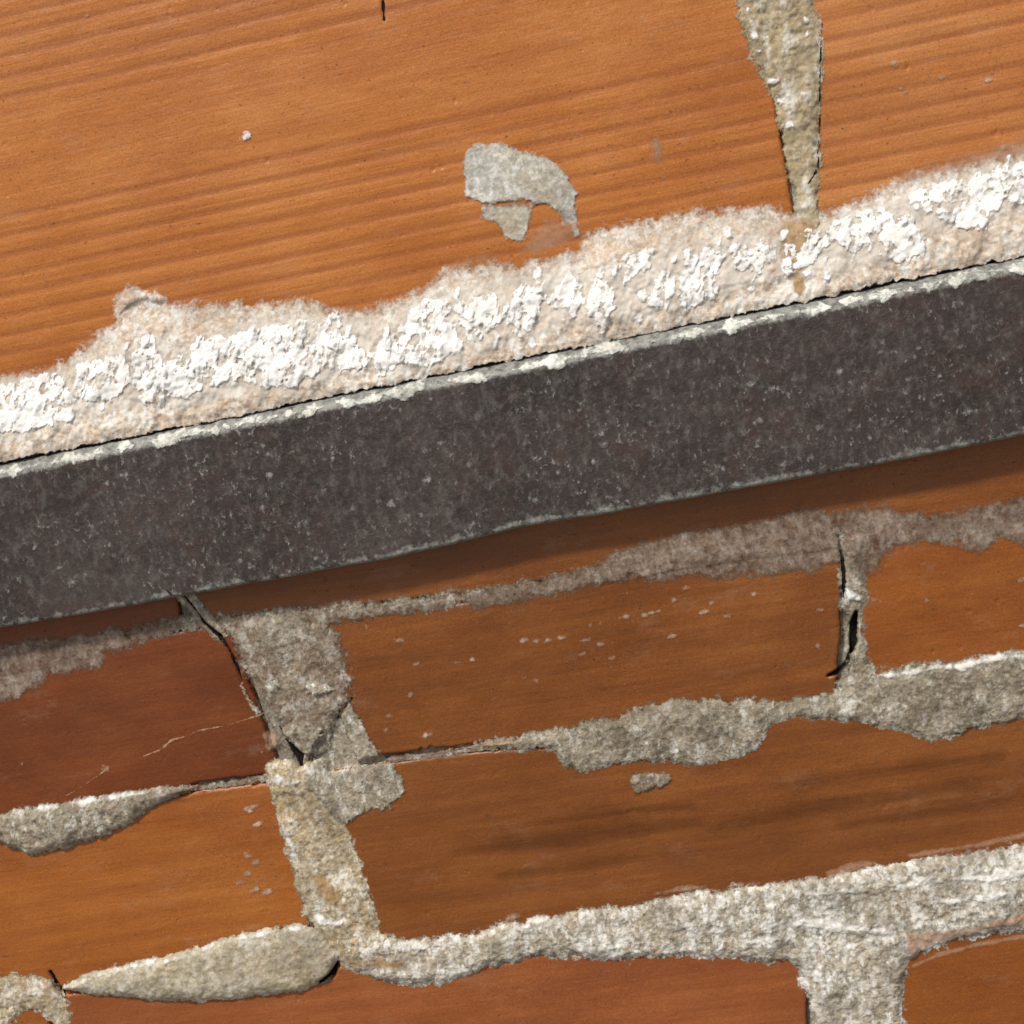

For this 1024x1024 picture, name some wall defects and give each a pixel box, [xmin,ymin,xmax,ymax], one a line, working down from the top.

leakage [0,144,1024,434]
leakage [0,447,105,478]
leakage [117,437,134,453]
leakage [149,403,323,449]
crack [827,540,858,676]
crack [165,589,242,679]
crack [279,726,304,766]